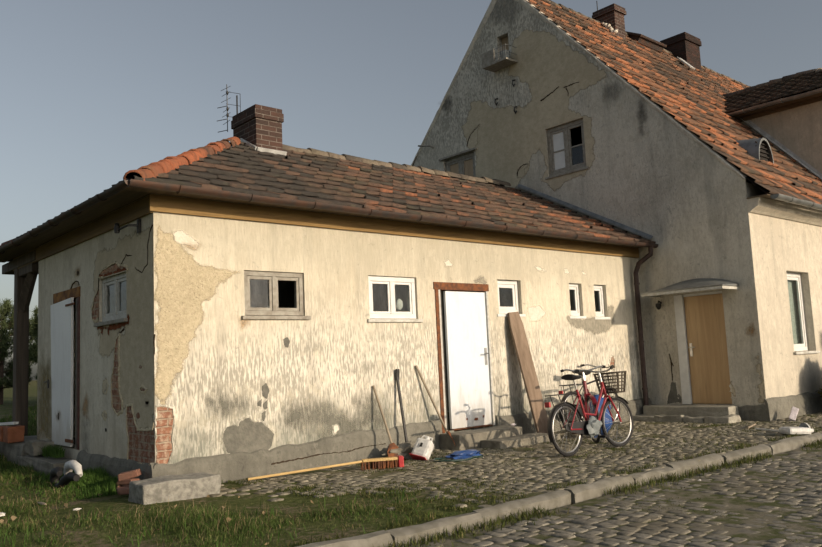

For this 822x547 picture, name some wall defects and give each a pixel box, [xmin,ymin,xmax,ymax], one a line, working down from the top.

flaking render [461,29,607,191]
crack [70,225,153,310]
flaking render [91,227,238,466]
flaking render [220,383,275,454]